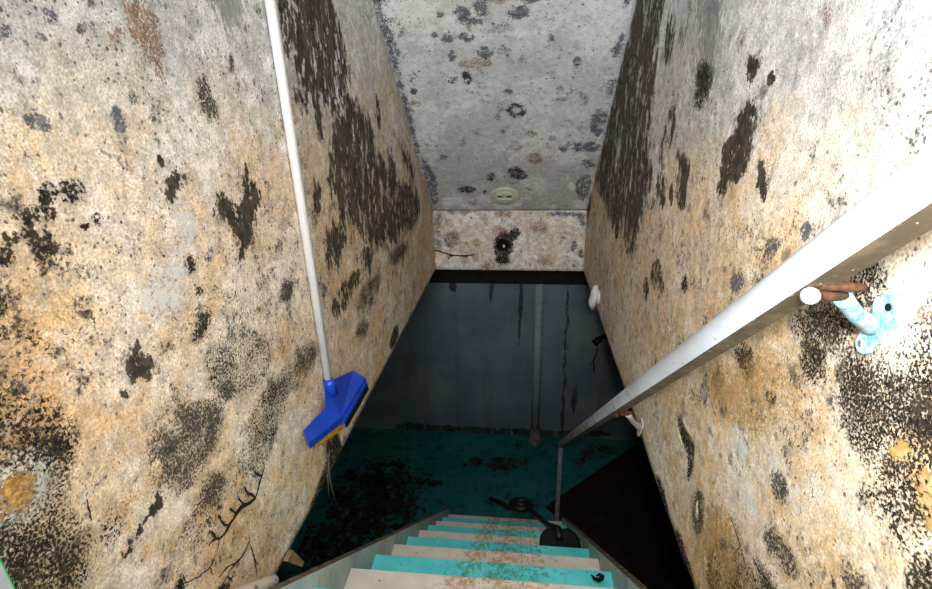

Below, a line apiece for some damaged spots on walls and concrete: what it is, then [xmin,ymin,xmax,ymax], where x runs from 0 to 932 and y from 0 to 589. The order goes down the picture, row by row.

water stain [430,0,494,61]
water stain [373,0,472,250]
water stain [557,108,608,201]
water stain [0,174,86,270]
water stain [80,212,104,231]
water stain [129,209,204,329]
water stain [332,240,408,340]
water stain [847,260,889,312]
water stain [0,381,135,589]
crack [183,467,265,586]
water stain [147,307,319,557]
water stain [698,294,932,589]